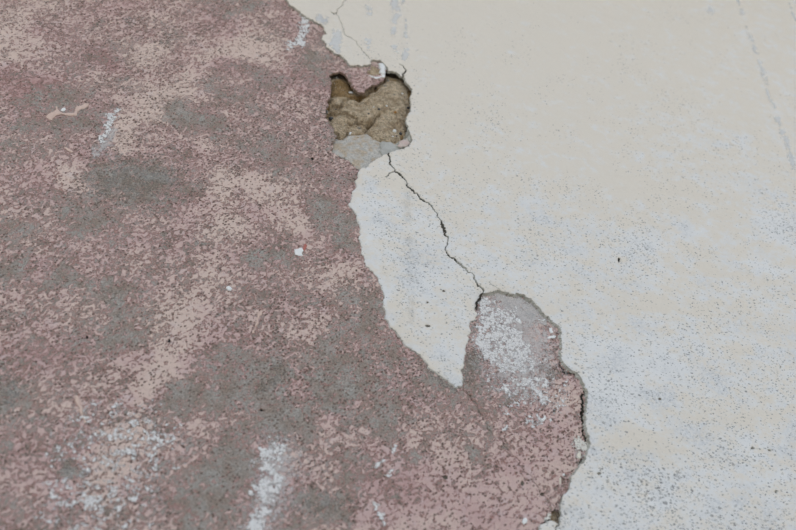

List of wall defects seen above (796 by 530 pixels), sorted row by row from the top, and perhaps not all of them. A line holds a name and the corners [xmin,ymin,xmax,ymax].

crack [388,153,457,262]
flaking render [0,0,587,530]
leakage [476,294,554,399]